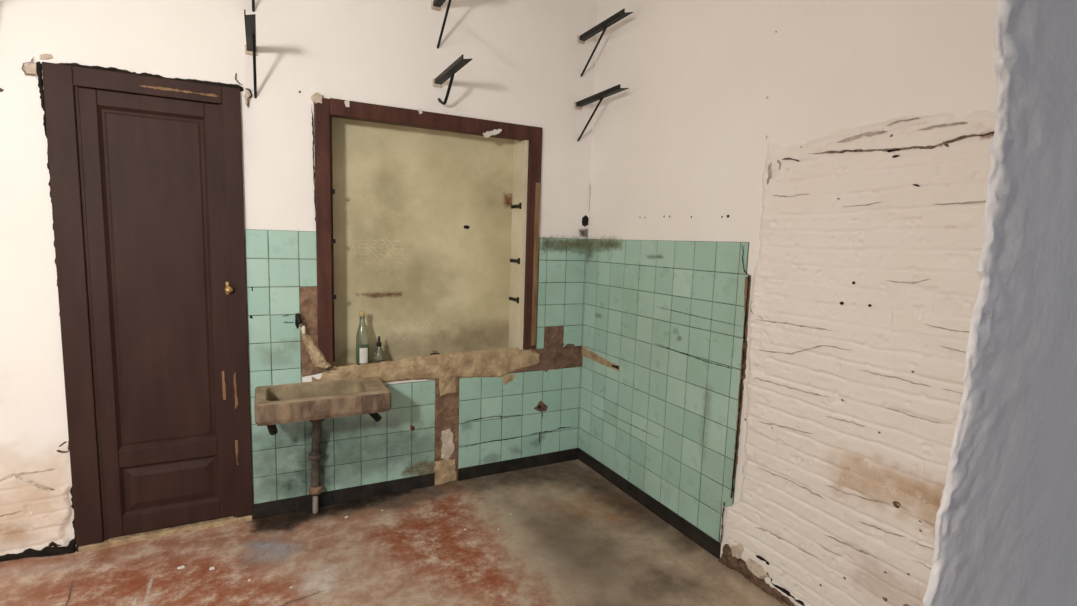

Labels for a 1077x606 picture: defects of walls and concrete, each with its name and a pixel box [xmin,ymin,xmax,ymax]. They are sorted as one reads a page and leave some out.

spalling [21,54,252,264]
crack [766,117,994,197]
crack [912,184,986,205]
leakage [542,238,618,255]
peeling [295,287,337,377]
spalling [503,326,583,385]
flaking render [719,110,995,606]
crack [0,441,70,490]
peeling [0,475,76,556]